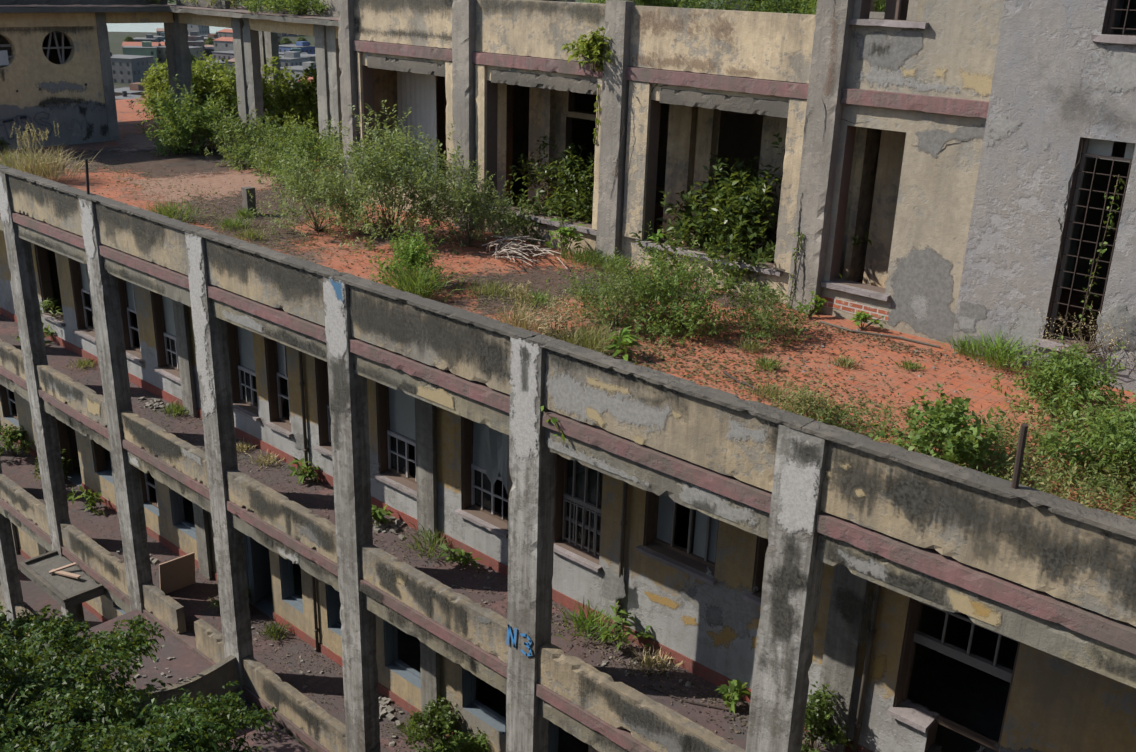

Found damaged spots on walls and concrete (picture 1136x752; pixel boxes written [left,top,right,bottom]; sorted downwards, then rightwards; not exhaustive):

leakage [482,0,604,22]
peeling [853,28,924,78]
crack [803,100,870,141]
peeling [916,115,1027,158]
leakage [7,175,78,218]
leakage [94,202,163,252]
leakage [349,288,529,391]
leakage [548,350,686,408]
leakage [765,423,1136,616]
leakage [760,536,807,697]
leakage [1093,648,1136,681]